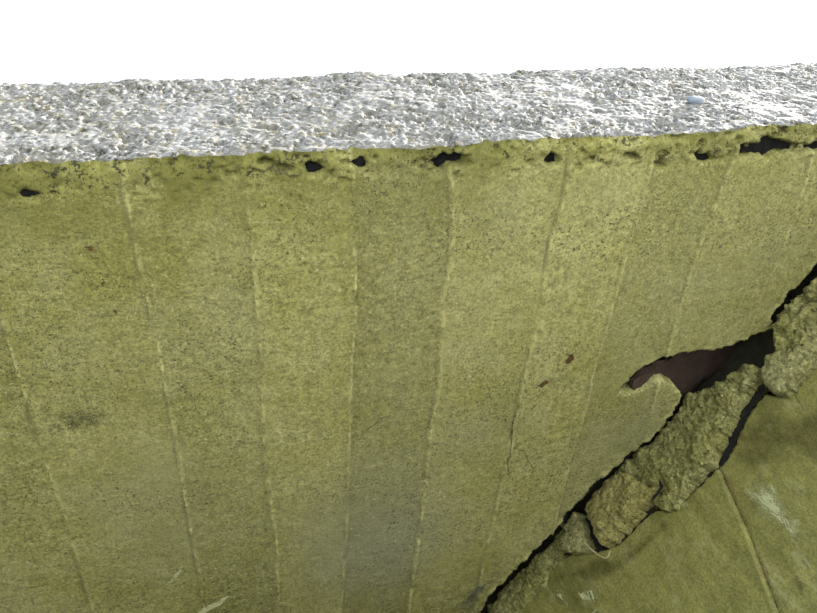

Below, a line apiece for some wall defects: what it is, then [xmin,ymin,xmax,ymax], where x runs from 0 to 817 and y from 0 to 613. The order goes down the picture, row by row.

crack [513,443,663,572]
crack [697,382,778,608]
water stain [753,485,797,533]